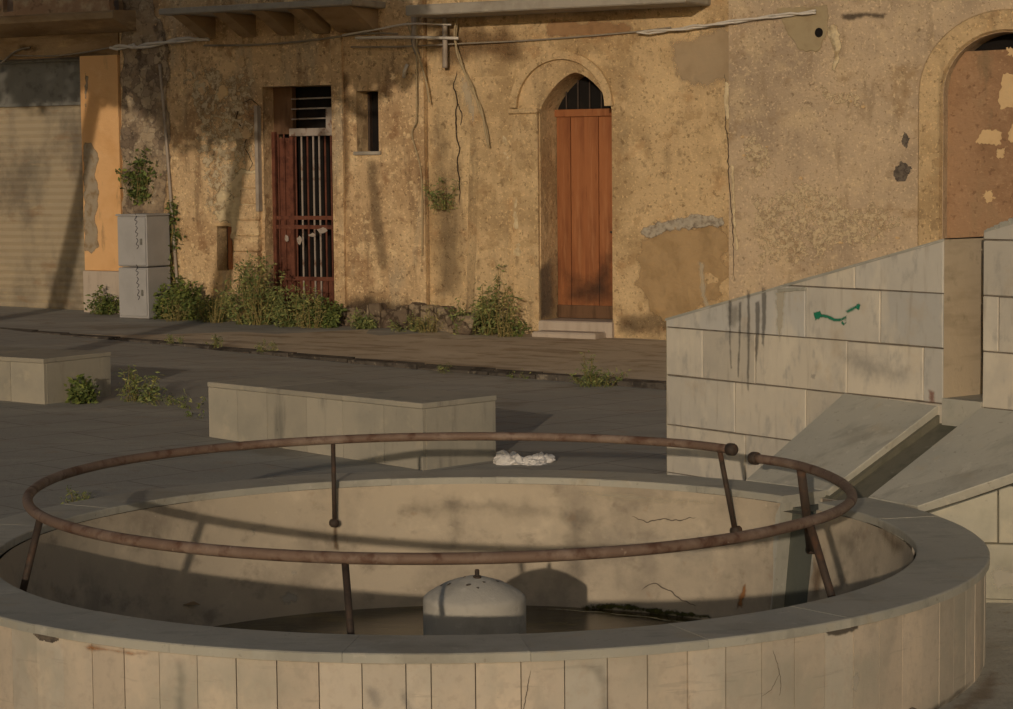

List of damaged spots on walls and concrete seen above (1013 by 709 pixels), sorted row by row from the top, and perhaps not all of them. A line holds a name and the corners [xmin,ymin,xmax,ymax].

peeling [998,73,1013,110]
crack [453,73,463,201]
peeling [976,124,1013,159]
peeling [83,143,99,253]
crack [632,515,696,523]
crack [642,583,695,606]